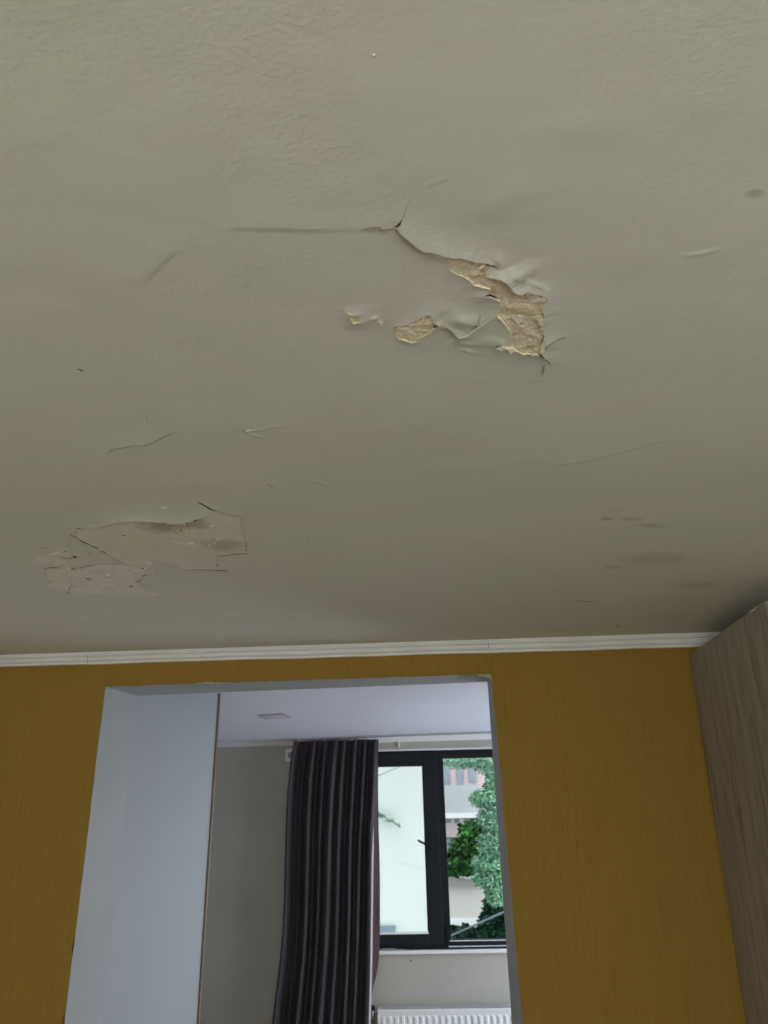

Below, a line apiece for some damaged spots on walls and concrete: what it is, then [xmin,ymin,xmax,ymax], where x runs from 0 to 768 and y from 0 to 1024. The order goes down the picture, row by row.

crack [394,200,415,248]
peeling [337,195,584,399]